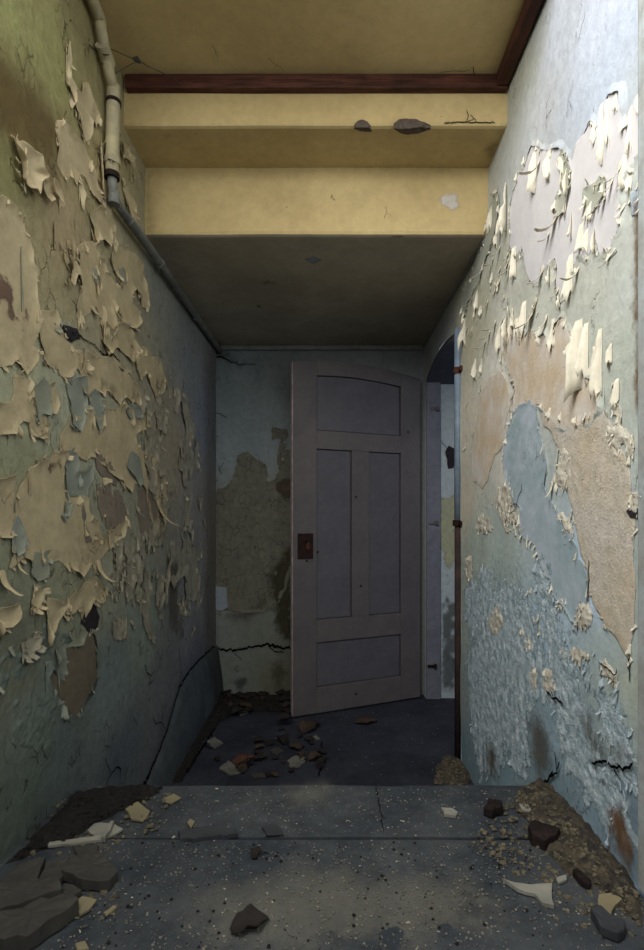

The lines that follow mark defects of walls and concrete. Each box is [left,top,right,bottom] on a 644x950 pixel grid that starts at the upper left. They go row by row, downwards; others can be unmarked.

peeling [0,41,291,727]
peeling [444,80,641,667]
water stain [270,548,291,639]
crack [105,642,291,786]
spalling [529,666,556,694]
spalling [560,647,619,695]
crack [544,752,560,783]
crack [591,759,633,776]